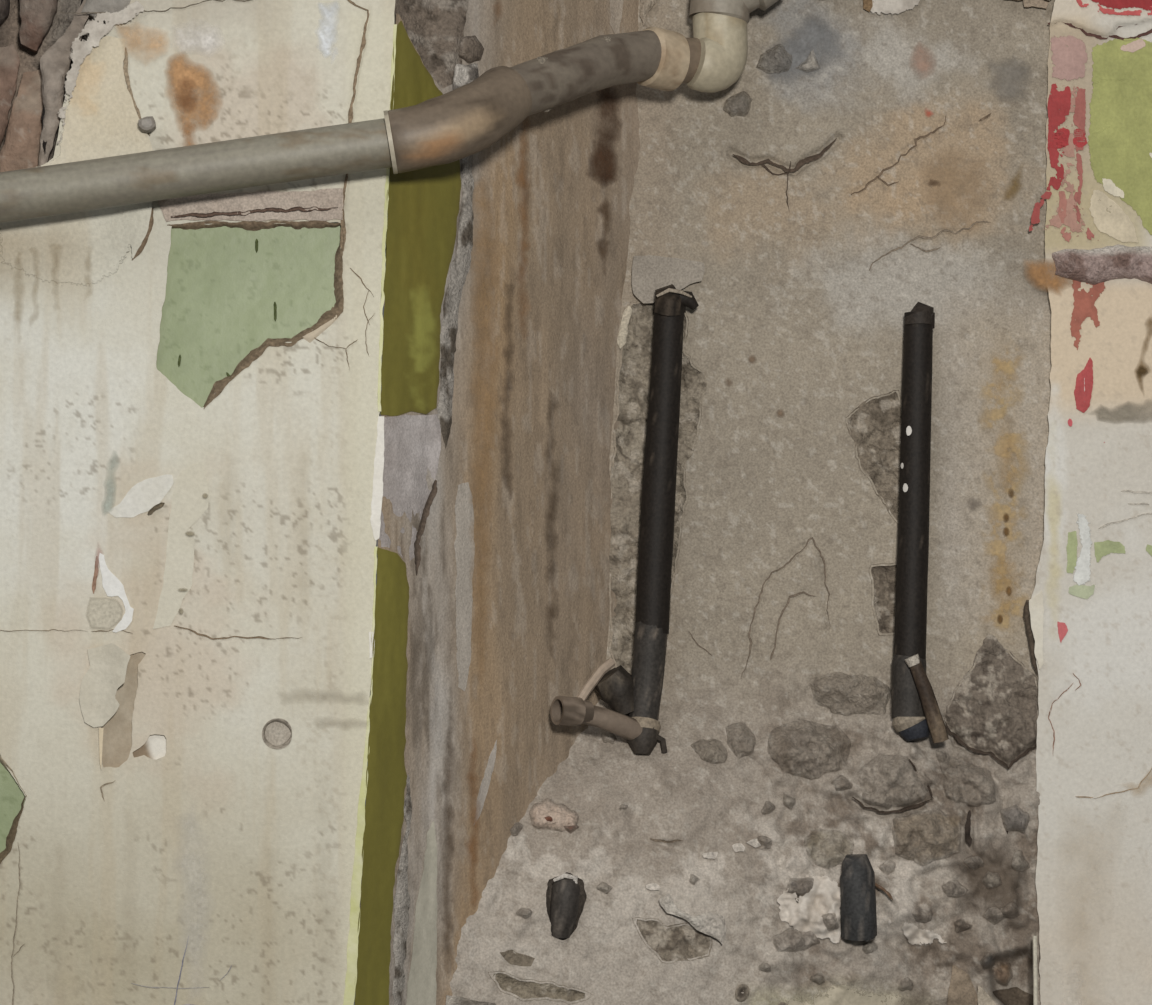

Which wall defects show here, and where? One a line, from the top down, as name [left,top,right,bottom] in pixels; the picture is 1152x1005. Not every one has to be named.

peeling [41,36,153,166]
corrosion [168,56,216,146]
crack [733,138,837,208]
crack [851,116,946,195]
peeling [0,188,344,409]
crack [869,221,986,271]
flaking render [608,301,655,674]
corrosion [986,359,1023,628]
crack [176,626,298,640]
peeling [343,155,474,1005]
crack [741,537,830,678]
spalling [944,591,1044,767]